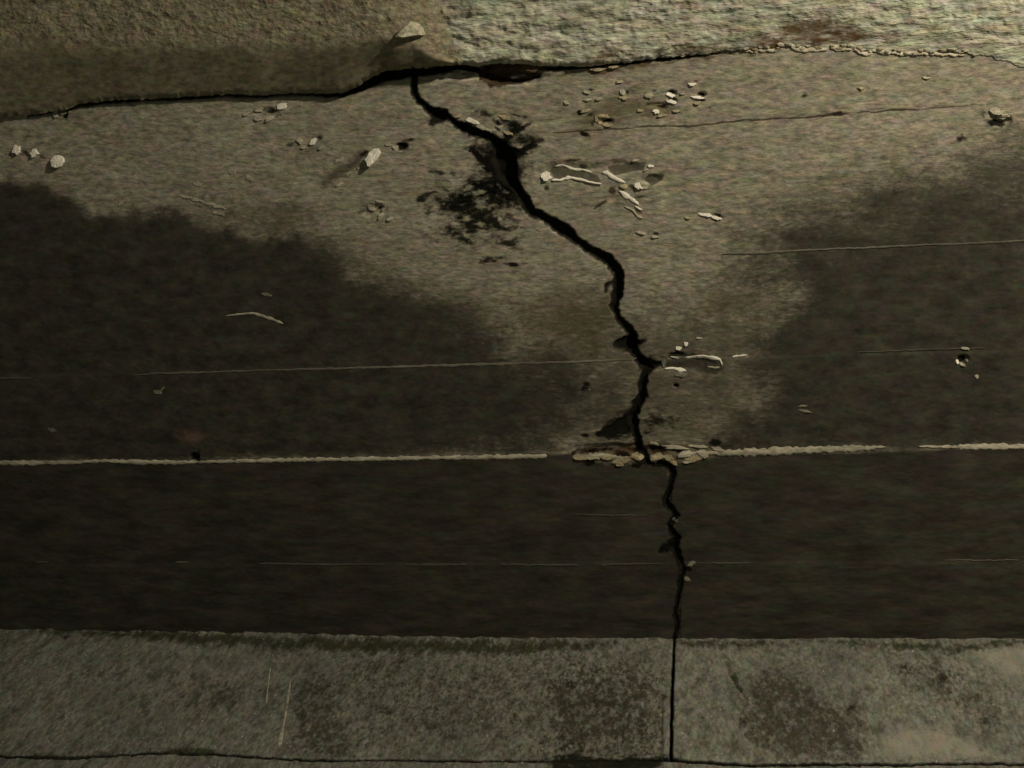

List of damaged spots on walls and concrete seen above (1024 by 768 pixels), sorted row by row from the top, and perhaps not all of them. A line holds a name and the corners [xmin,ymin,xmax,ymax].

crack [513,52,735,84]
peeling [540,159,664,238]
crack [27,65,967,641]
leakage [0,138,1024,644]
spalling [661,337,748,387]
spalling [572,434,724,467]